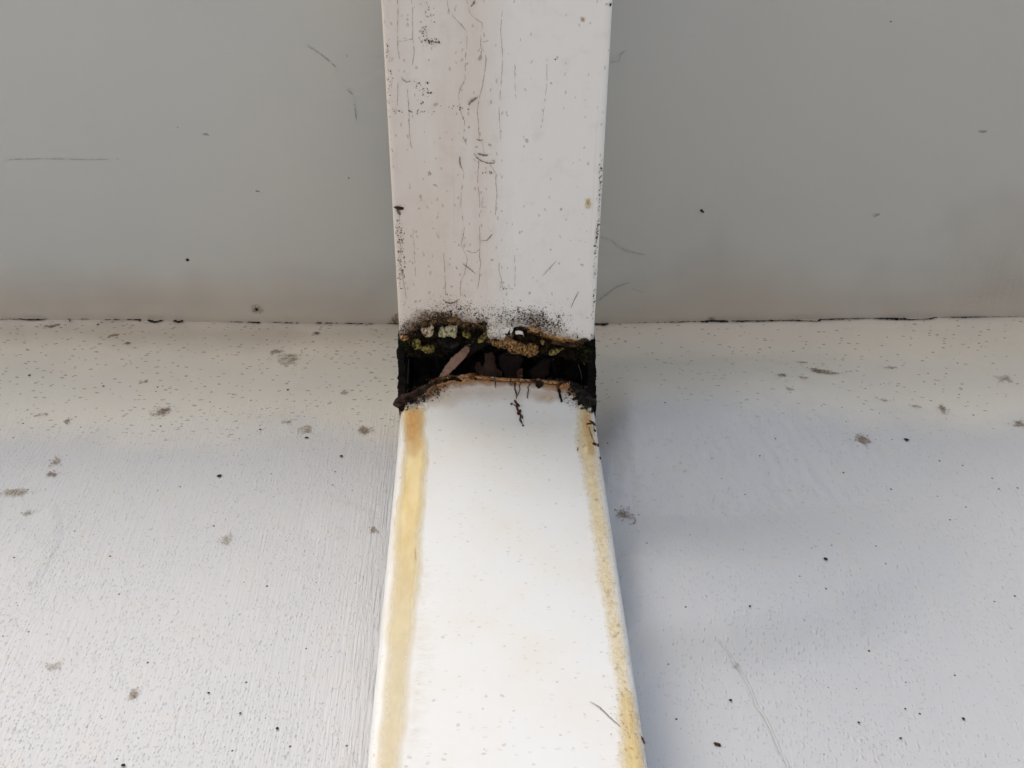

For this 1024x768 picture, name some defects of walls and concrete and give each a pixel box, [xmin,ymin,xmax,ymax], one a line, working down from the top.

peeling [400,317,579,357]
damp [399,288,591,347]